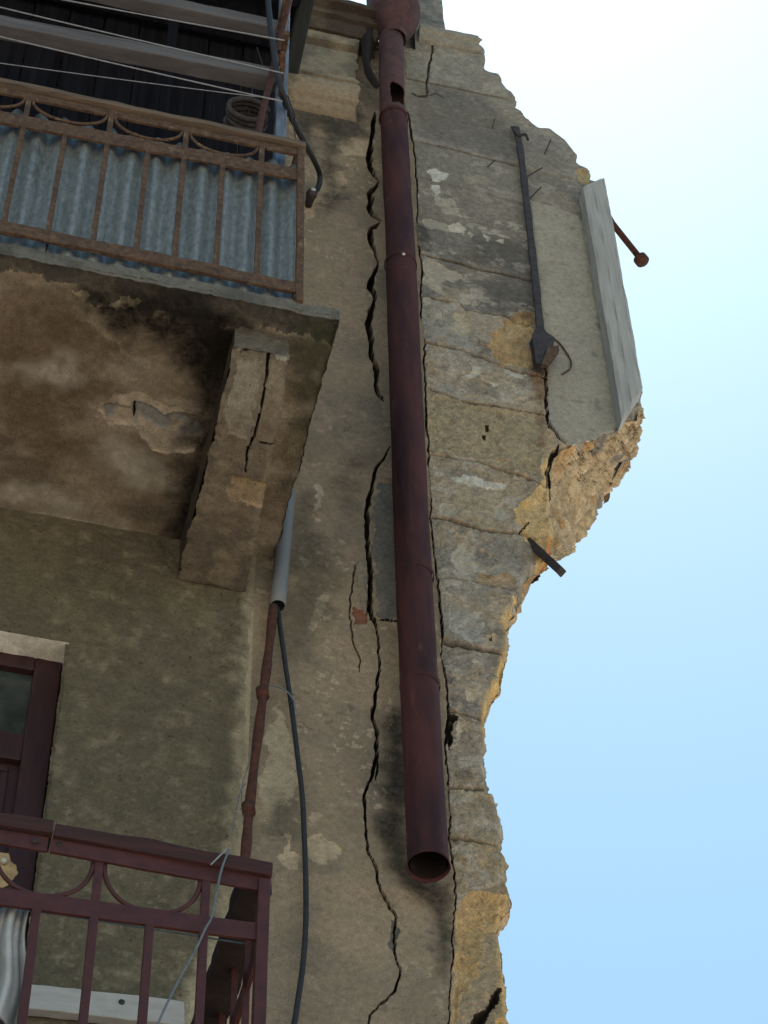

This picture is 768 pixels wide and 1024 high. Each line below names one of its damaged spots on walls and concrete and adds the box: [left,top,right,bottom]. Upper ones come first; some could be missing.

crack [364,112,384,402]
leakage [105,436,170,489]
flaking render [98,389,204,454]
leakage [172,325,234,541]
crack [239,348,275,472]
spalling [426,390,646,651]
crack [544,368,566,501]
crack [349,446,402,1024]